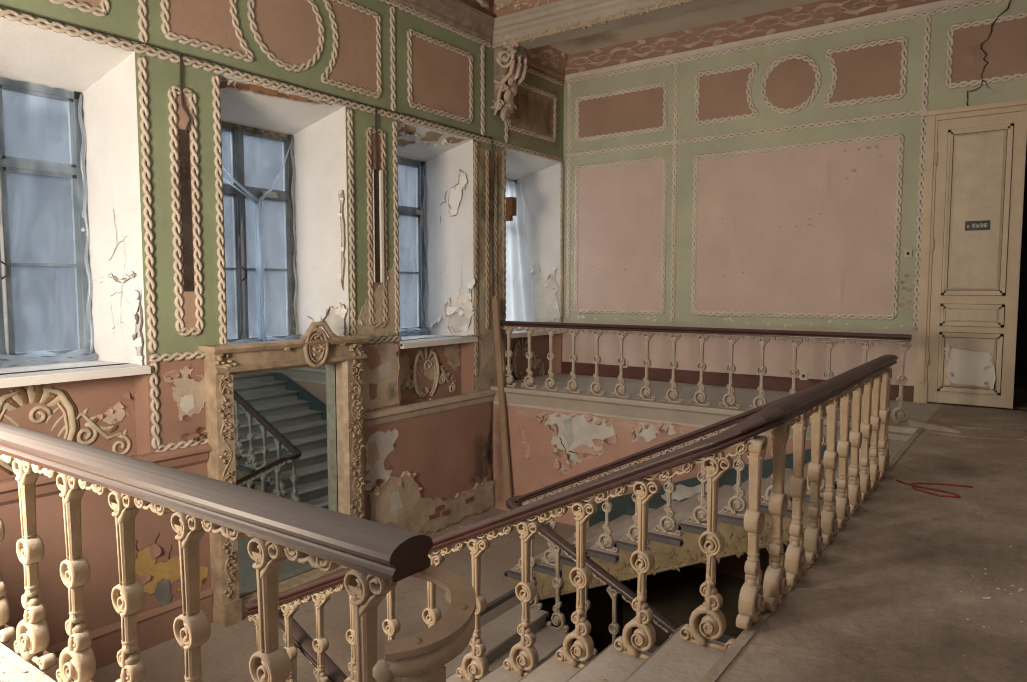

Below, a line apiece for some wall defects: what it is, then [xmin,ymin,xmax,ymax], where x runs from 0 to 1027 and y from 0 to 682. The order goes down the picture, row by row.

crack [966,0,1011,106]
peeling [397,123,465,148]
peeling [307,302,347,337]
peeling [336,190,345,290]
spalling [430,148,504,392]
peeling [531,261,597,323]
peeling [164,364,207,443]
peeling [362,342,435,412]
peeling [536,411,617,477]
peeling [630,421,685,456]
spalling [364,429,496,535]
peeling [135,532,181,607]